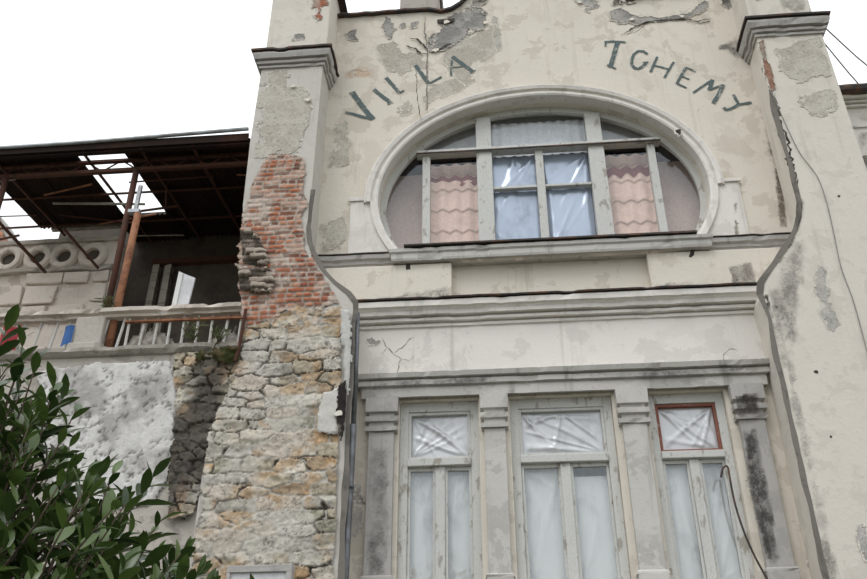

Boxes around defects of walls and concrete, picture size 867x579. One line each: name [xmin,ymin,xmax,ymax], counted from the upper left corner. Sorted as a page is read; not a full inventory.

spalling [311,0,329,22]
spalling [574,0,599,14]
spalling [609,0,709,26]
spalling [375,0,502,117]
spalling [757,36,831,90]
spalling [796,89,838,117]
spalling [167,69,353,579]
spalling [813,265,841,331]
water stain [746,434,775,559]
spalling [855,523,867,562]